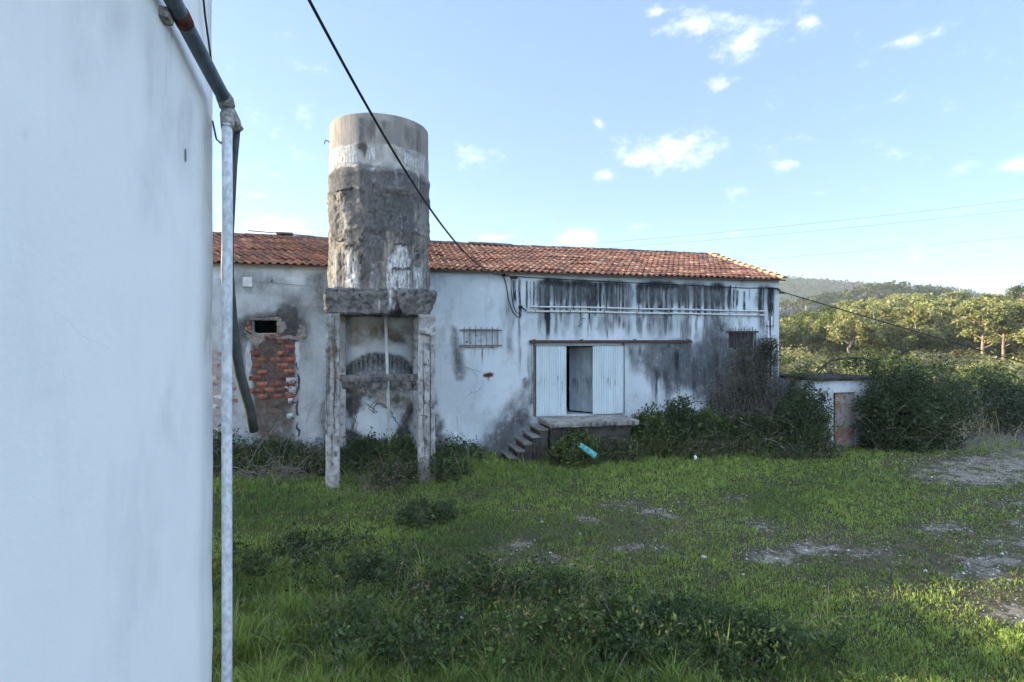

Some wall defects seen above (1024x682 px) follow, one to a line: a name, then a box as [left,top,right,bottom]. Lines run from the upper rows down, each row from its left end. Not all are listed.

peeling [331,145,376,181]
peeling [333,209,423,290]
flaking render [244,317,307,446]
damp [454,329,463,379]
damp [513,279,777,424]
damp [464,395,532,453]